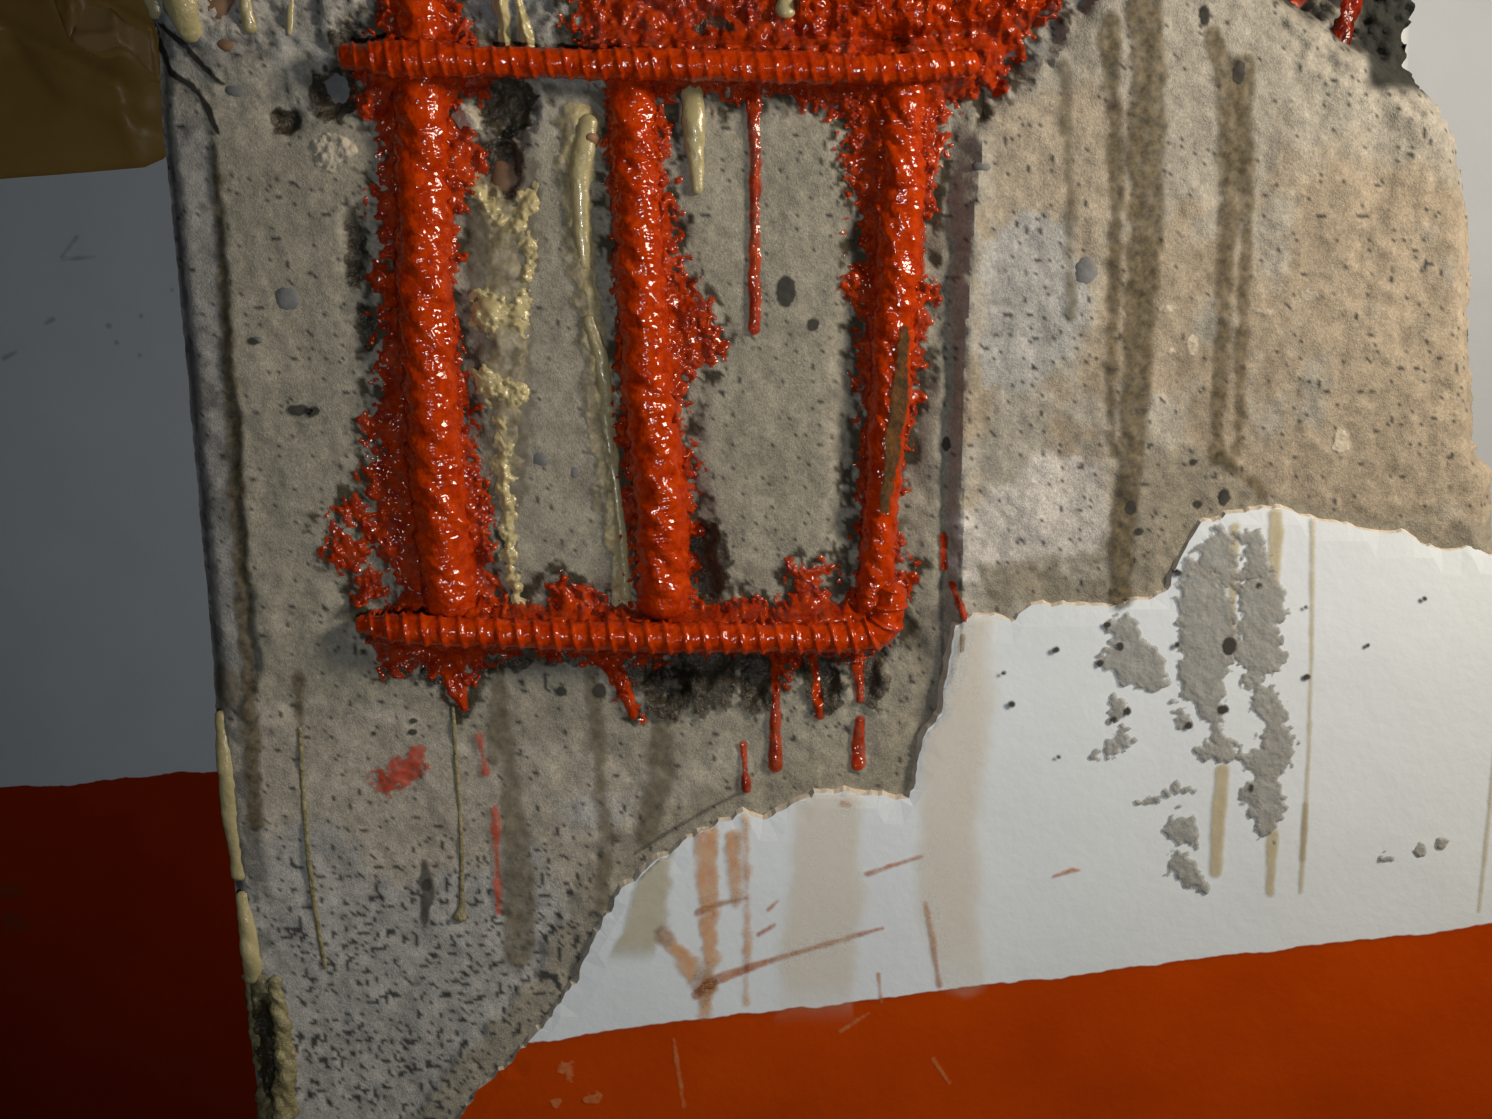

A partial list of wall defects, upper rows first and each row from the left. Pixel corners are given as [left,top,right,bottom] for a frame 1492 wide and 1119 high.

leakage [1100,0,1198,608]
leakage [1206,28,1283,581]
flaking render [153,0,1492,812]
leakage [1332,428,1351,453]
leakage [489,678,534,966]
leakage [586,659,615,909]
leakage [617,858,670,950]
rust [656,817,879,1014]
rust [925,902,941,987]
leakage [1212,765,1228,876]
leakage [1267,830,1278,895]